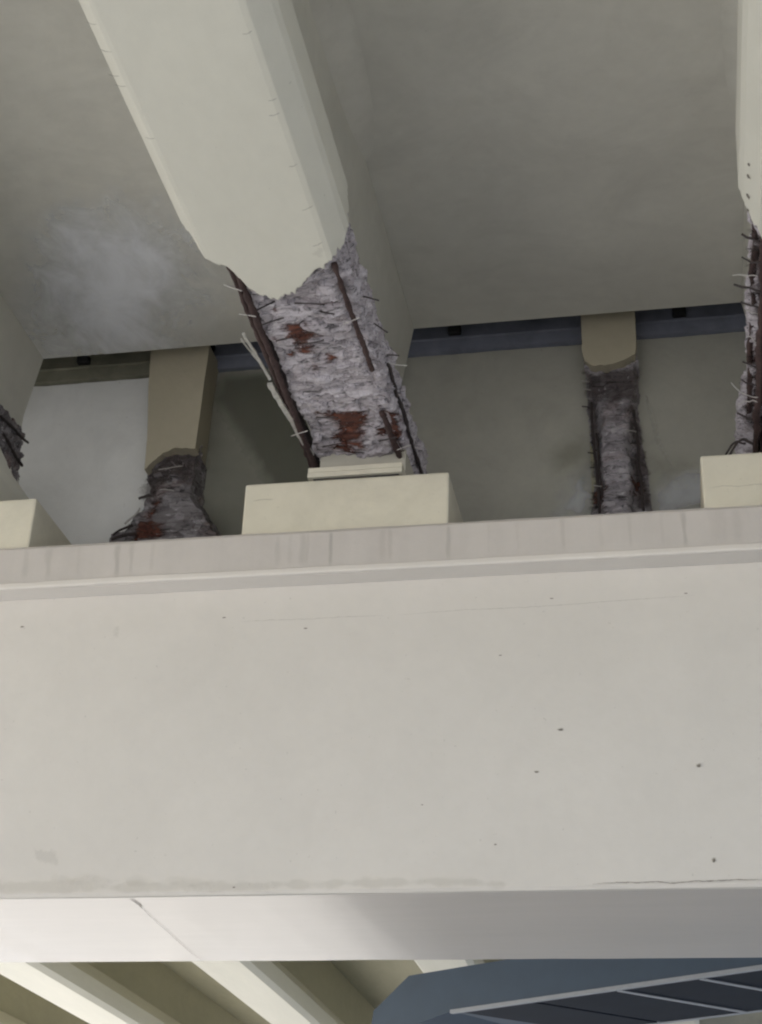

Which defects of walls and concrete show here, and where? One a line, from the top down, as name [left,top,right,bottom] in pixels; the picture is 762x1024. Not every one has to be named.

spalling [224,214,428,475]
spalling [725,194,762,455]
spalling [0,405,29,481]
spalling [109,446,223,543]
spalling [581,353,653,515]
crack [598,877,759,885]